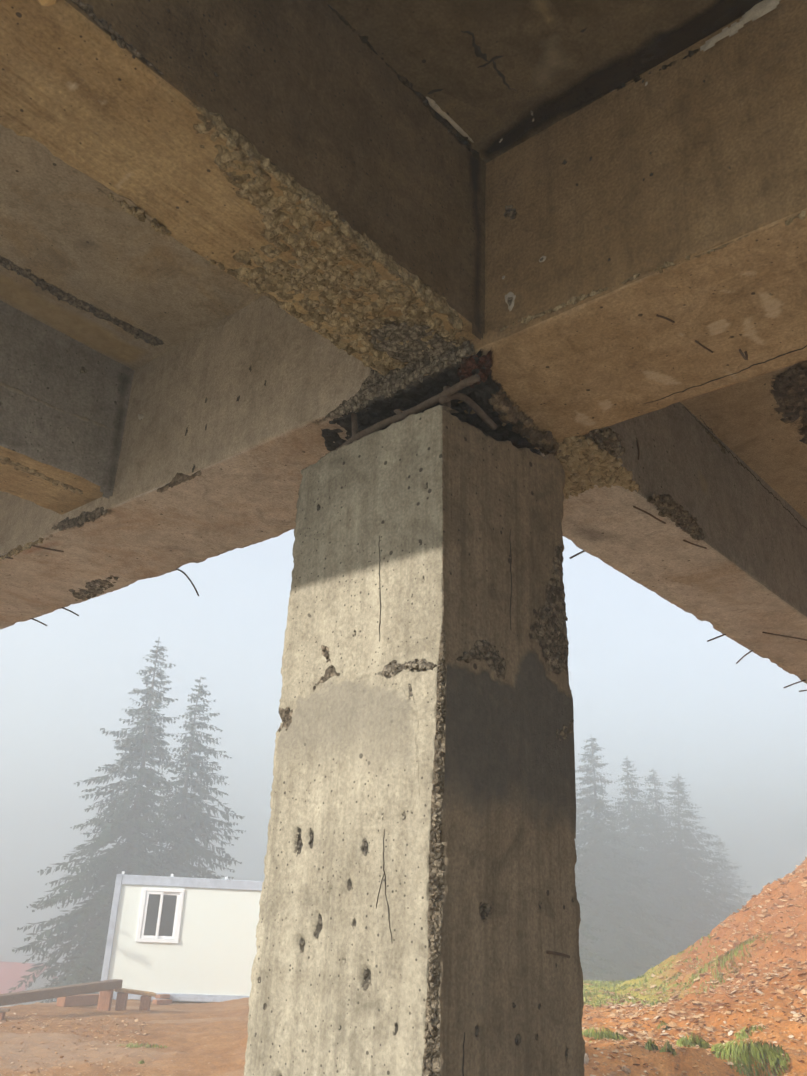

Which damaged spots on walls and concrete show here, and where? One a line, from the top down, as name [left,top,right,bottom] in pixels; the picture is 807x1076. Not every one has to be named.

crack [461,31,517,91]
water stain [411,0,764,340]
spalling [193,97,561,456]
spalling [589,428,640,460]
spalling [771,360,807,444]
spalling [0,507,112,559]
spalling [378,587,506,733]
spalling [529,545,585,674]
spalling [423,750,444,1040]